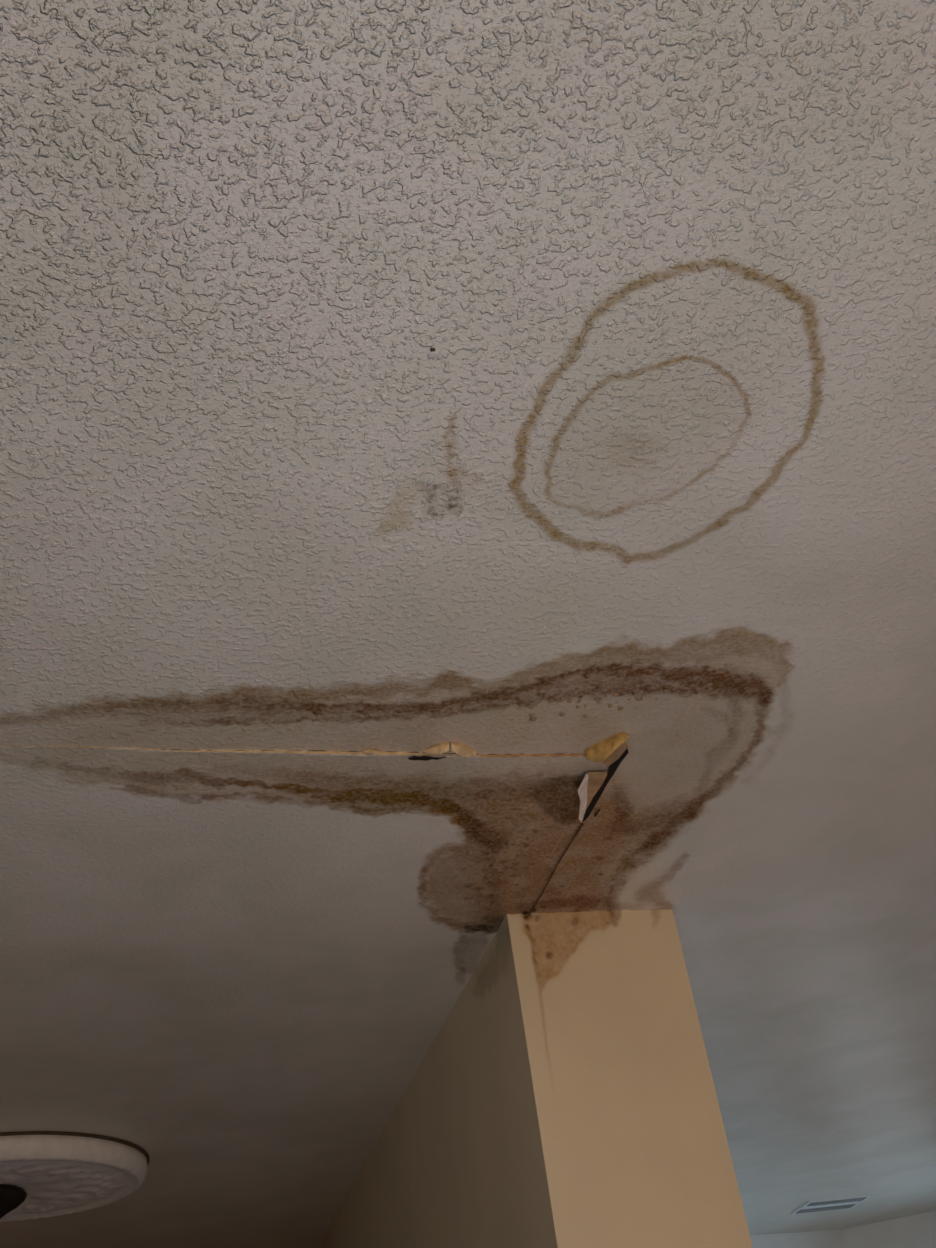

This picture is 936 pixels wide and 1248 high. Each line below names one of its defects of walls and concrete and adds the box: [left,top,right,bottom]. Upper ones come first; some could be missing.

damp [357,664,768,715]
crack [51,742,586,761]
damp [229,781,475,825]
crack [529,809,600,915]